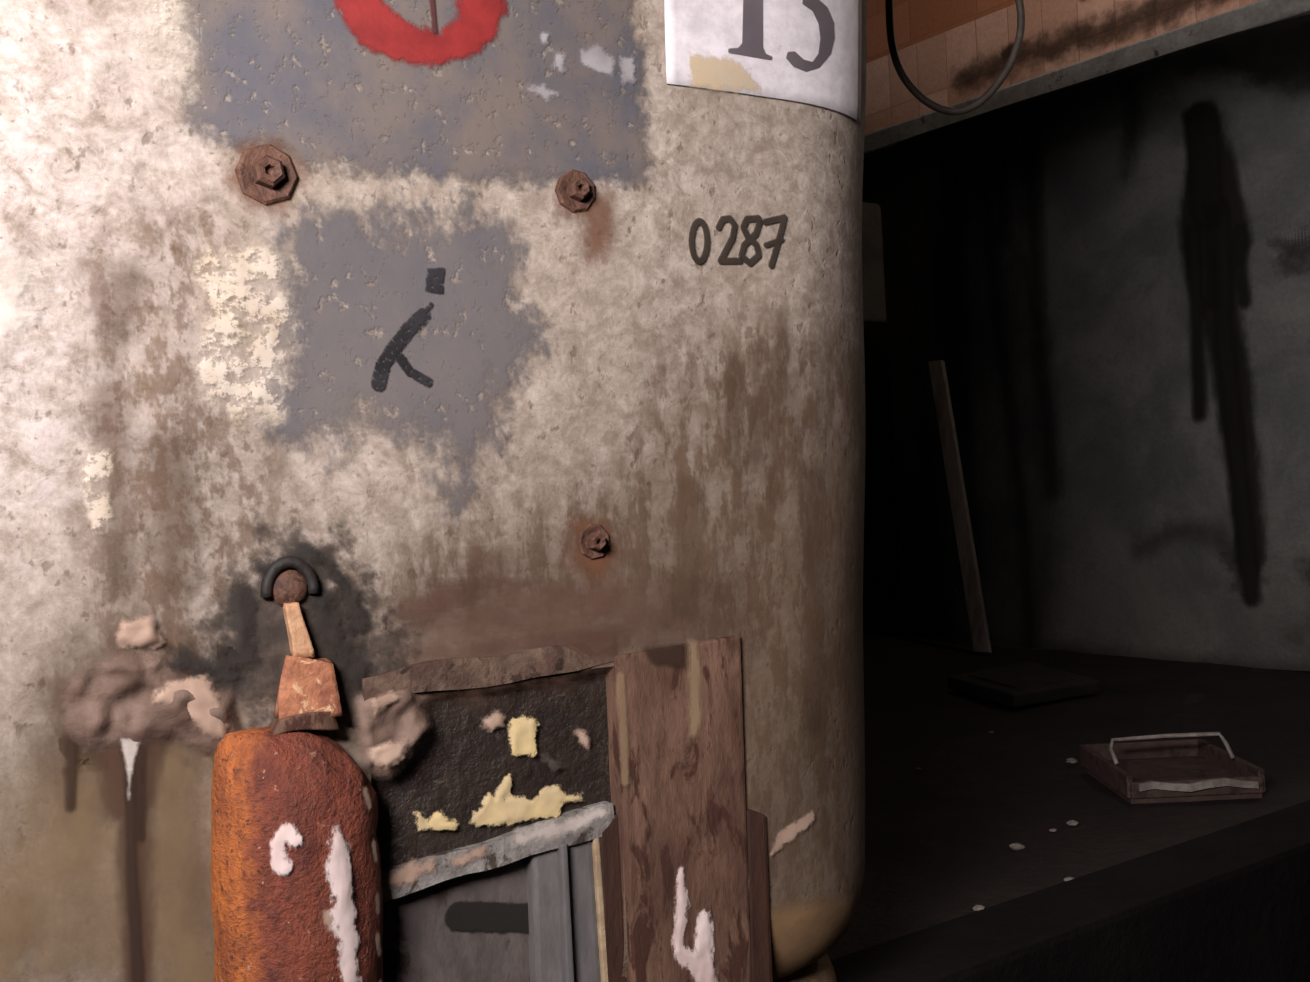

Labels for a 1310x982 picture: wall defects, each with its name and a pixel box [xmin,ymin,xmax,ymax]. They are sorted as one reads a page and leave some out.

corrosion [564,196,610,251]
leakage [1180,102,1265,605]
leakage [102,229,373,694]
peeling [116,615,163,649]
leakage [523,344,849,875]
peeling [152,675,228,739]
peeling [370,690,398,715]
peeling [369,739,407,767]
leakage [0,738,213,982]